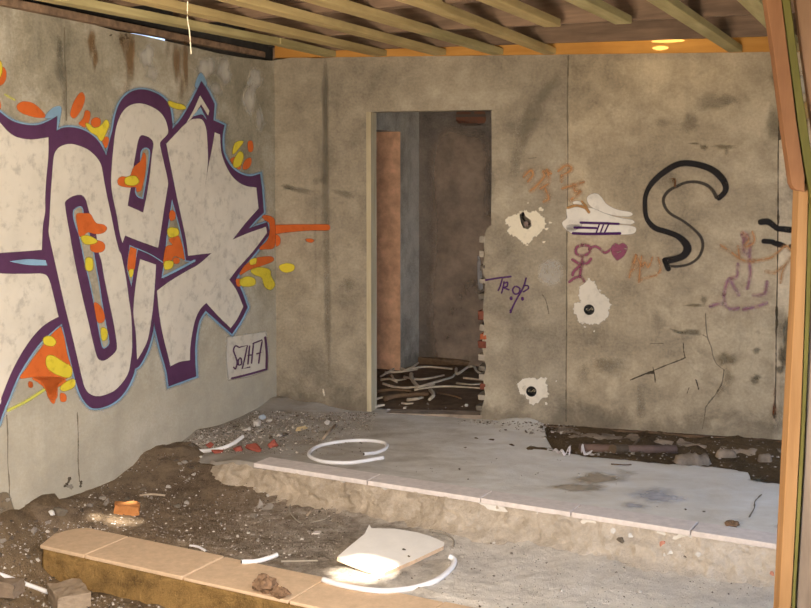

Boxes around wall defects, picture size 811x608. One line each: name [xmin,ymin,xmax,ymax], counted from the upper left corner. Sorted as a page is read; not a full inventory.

spalling [476,309,487,411]
crack [630,343,686,382]
crack [687,313,724,429]